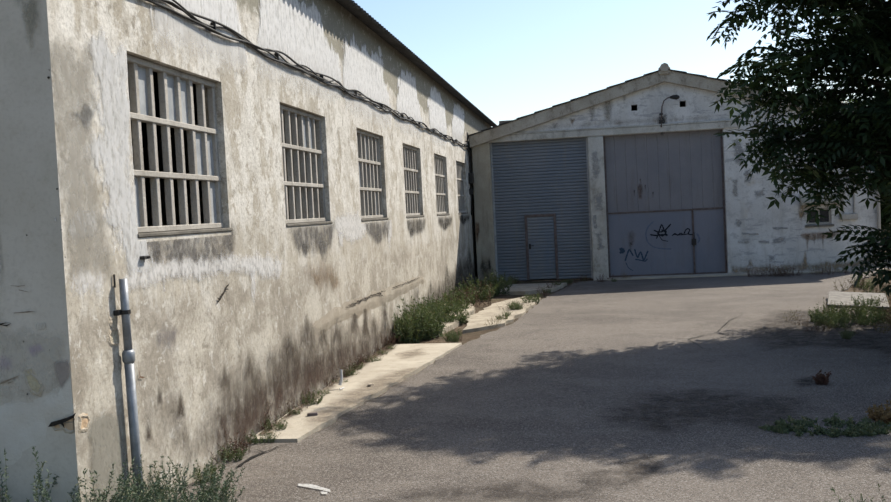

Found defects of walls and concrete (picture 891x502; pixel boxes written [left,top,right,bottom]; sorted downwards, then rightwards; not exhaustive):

damp [294,212,392,254]
damp [408,220,425,235]
damp [212,309,396,441]
flaking render [52,413,90,434]